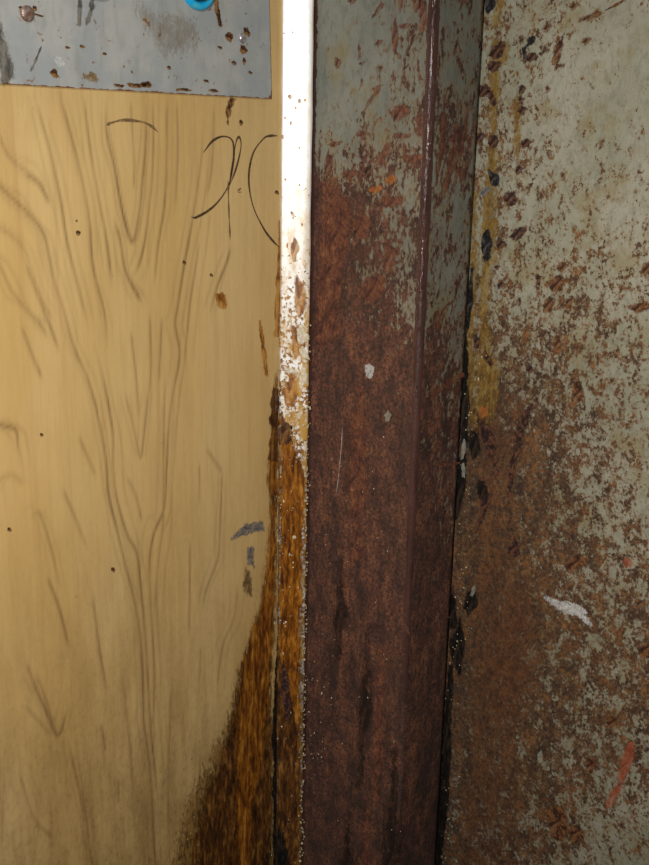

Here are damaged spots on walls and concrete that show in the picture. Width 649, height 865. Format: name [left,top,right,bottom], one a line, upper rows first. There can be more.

rust [374,0,427,59]
rust [551,32,565,68]
rust [324,132,411,194]
rust [291,239,299,262]
rust [290,277,306,358]
rust [430,41,538,560]
rust [535,262,574,312]
rust [628,301,649,313]
peeling [284,323,312,437]
rust [571,382,584,405]
peeling [301,448,311,769]
rust [546,806,584,843]